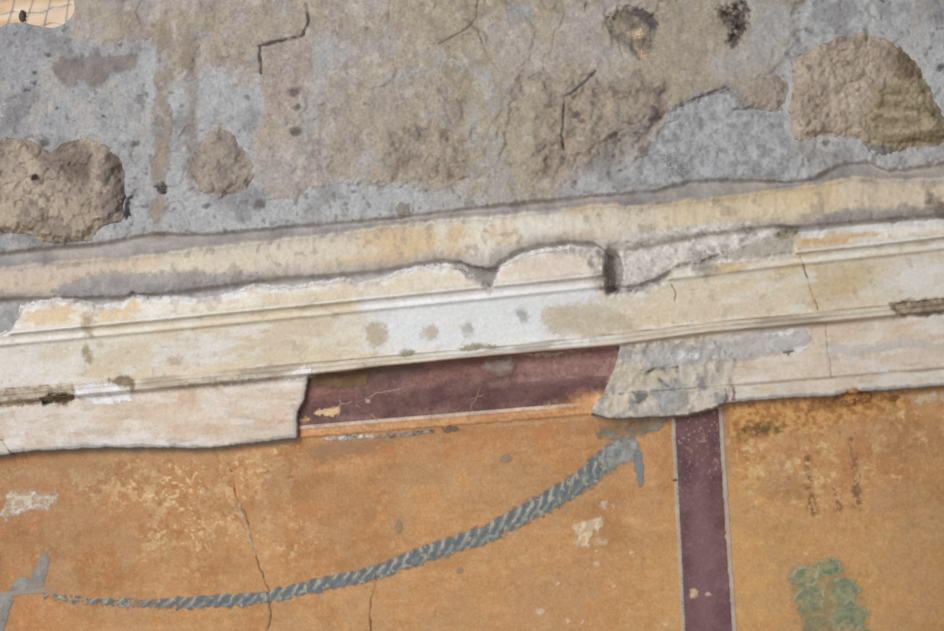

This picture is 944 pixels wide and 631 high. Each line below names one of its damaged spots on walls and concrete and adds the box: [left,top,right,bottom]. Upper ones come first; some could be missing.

crack [258,13,309,74]
spalling [610,8,657,59]
spalling [719,3,750,43]
crack [560,71,596,150]
spalling [0,300,20,331]
spalling [609,328,811,388]
crack [256,557,271,628]